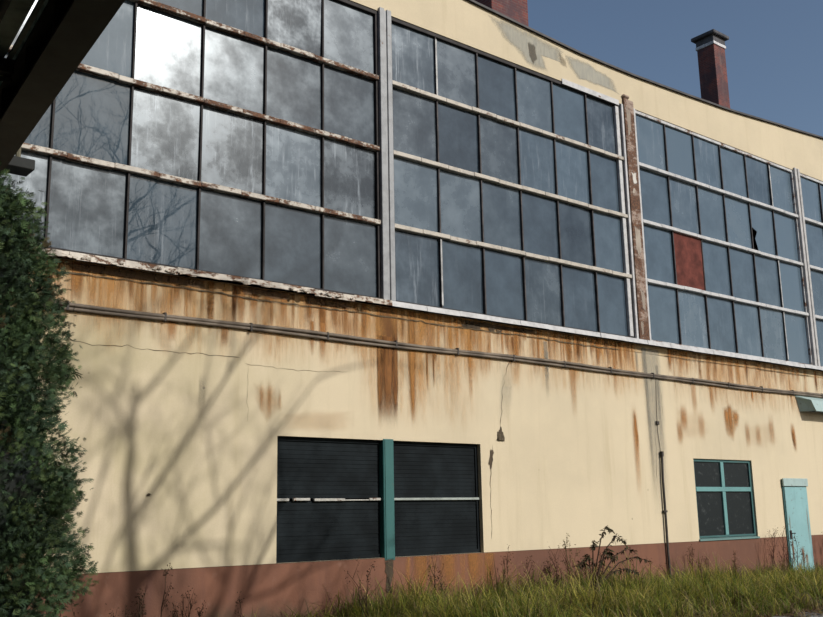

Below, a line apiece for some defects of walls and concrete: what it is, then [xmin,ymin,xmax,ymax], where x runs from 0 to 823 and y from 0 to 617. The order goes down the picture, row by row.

peeling [497,22,615,91]
corrosion [72,261,144,308]
spalling [44,250,205,289]
corrosion [162,281,270,319]
spalling [234,278,353,309]
crack [42,269,620,423]
corrosion [282,292,490,410]
corrosion [501,325,526,362]
corrosion [537,329,634,369]
corrosion [725,407,737,433]